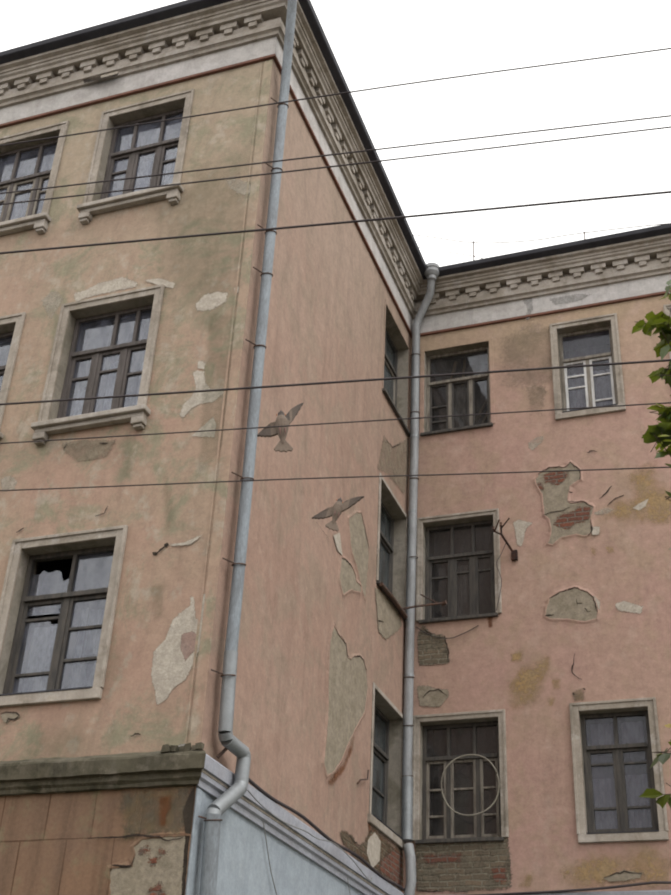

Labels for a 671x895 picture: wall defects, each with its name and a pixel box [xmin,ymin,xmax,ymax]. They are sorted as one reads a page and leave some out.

peeling [180,361,224,417]
spalling [513,457,624,549]
spalling [539,582,605,627]
peeling [151,594,205,705]
spalling [417,625,450,666]
spalling [320,618,369,784]
spalling [88,788,195,895]
spalling [339,828,404,891]
spalling [415,831,513,893]